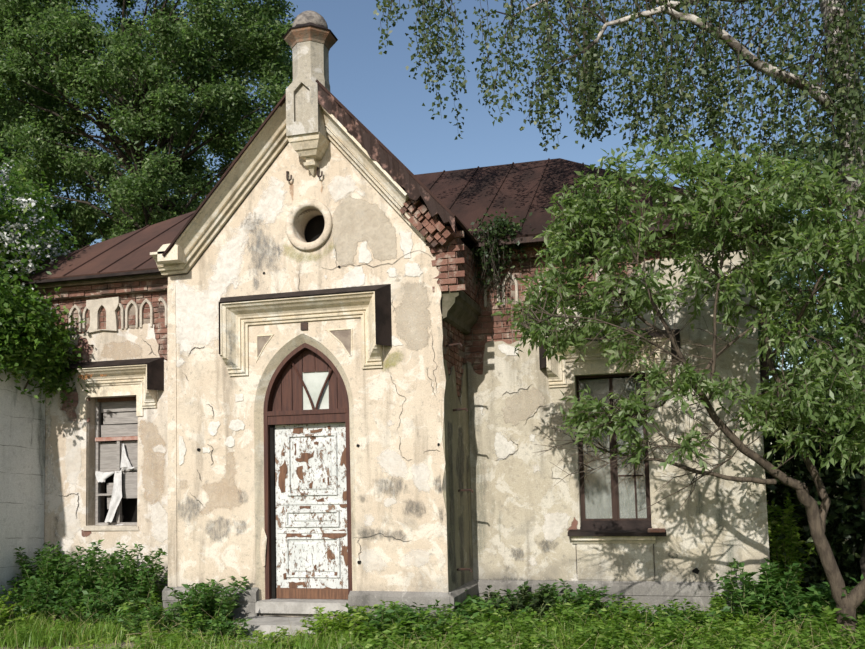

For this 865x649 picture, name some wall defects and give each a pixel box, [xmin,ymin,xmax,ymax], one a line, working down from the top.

peeling [38,176,287,372]
flaking render [328,175,679,402]
flaking render [45,387,90,483]
peeling [139,420,168,556]
peeling [201,419,245,514]
peeling [278,426,331,509]
peeling [277,572,306,599]
peeling [286,529,348,566]
crack [354,533,406,560]